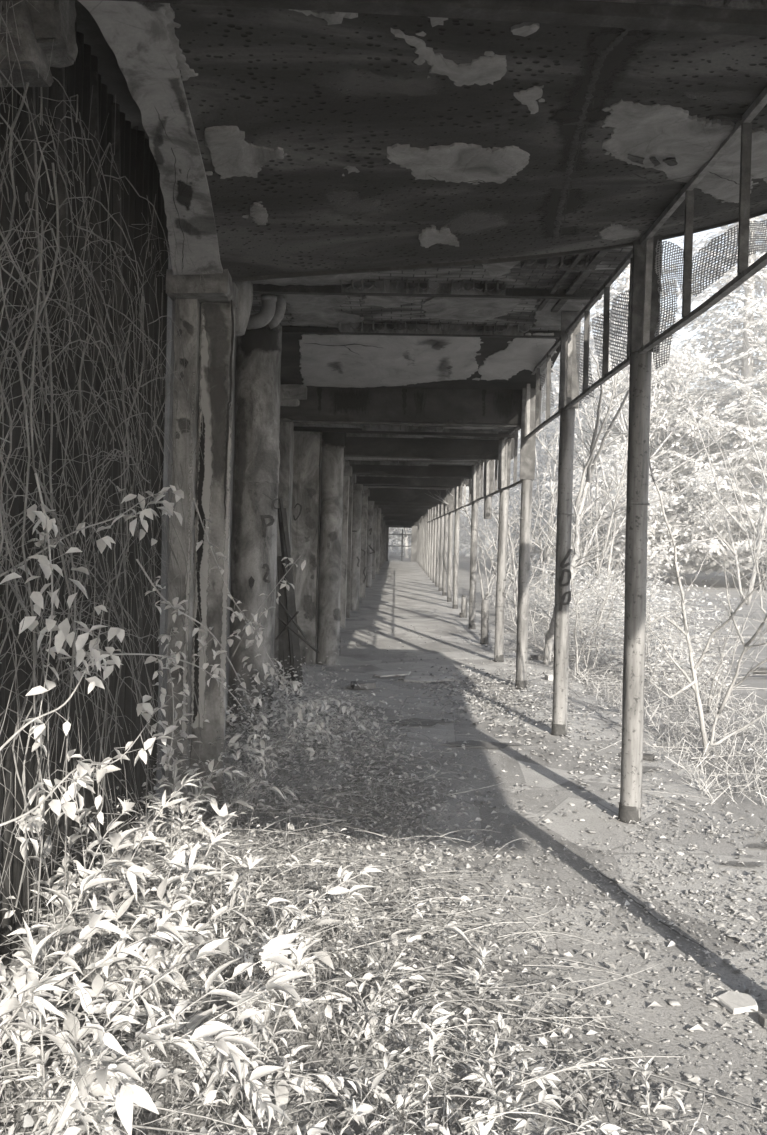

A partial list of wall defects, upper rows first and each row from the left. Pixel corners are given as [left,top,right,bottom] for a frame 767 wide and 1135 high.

flaking render [164,3,198,81]
flaking render [391,17,507,87]
flaking render [511,22,540,37]
flaking render [514,85,545,114]
flaking render [176,169,193,211]
flaking render [204,125,287,179]
flaking render [242,201,268,225]
flaking render [419,225,459,248]
flaking render [387,143,530,190]
flaking render [602,99,767,203]
flaking render [251,272,588,388]